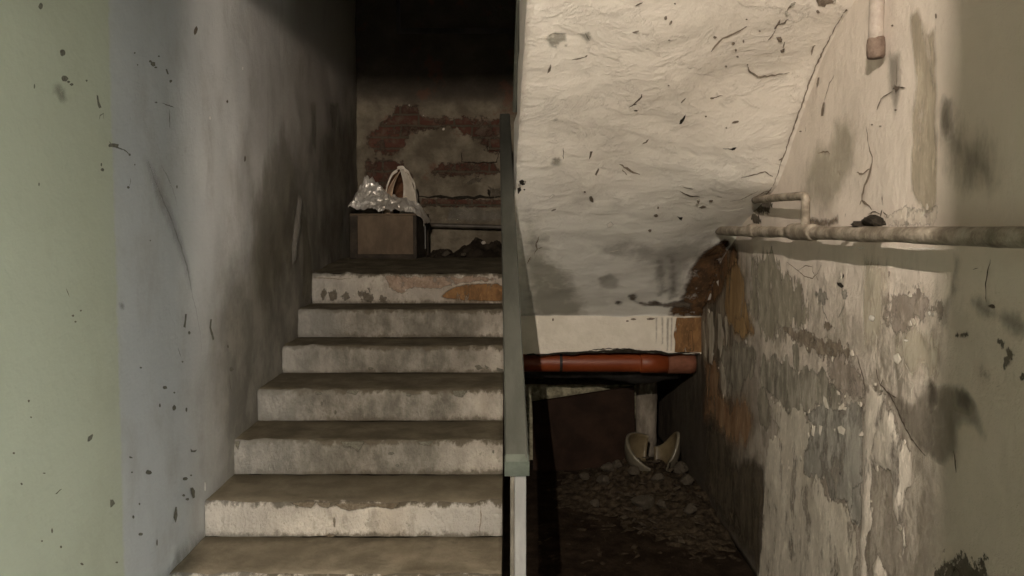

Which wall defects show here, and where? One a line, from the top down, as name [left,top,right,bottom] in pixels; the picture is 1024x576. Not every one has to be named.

flaking render [365,104,500,189]
crack [730,9,848,202]
crack [818,72,905,217]
water stain [911,12,936,210]
peeling [311,275,494,303]
corrosion [670,240,755,352]
peeling [883,285,943,342]
peeling [703,247,865,576]
crack [856,355,923,453]
peeling [292,502,399,537]